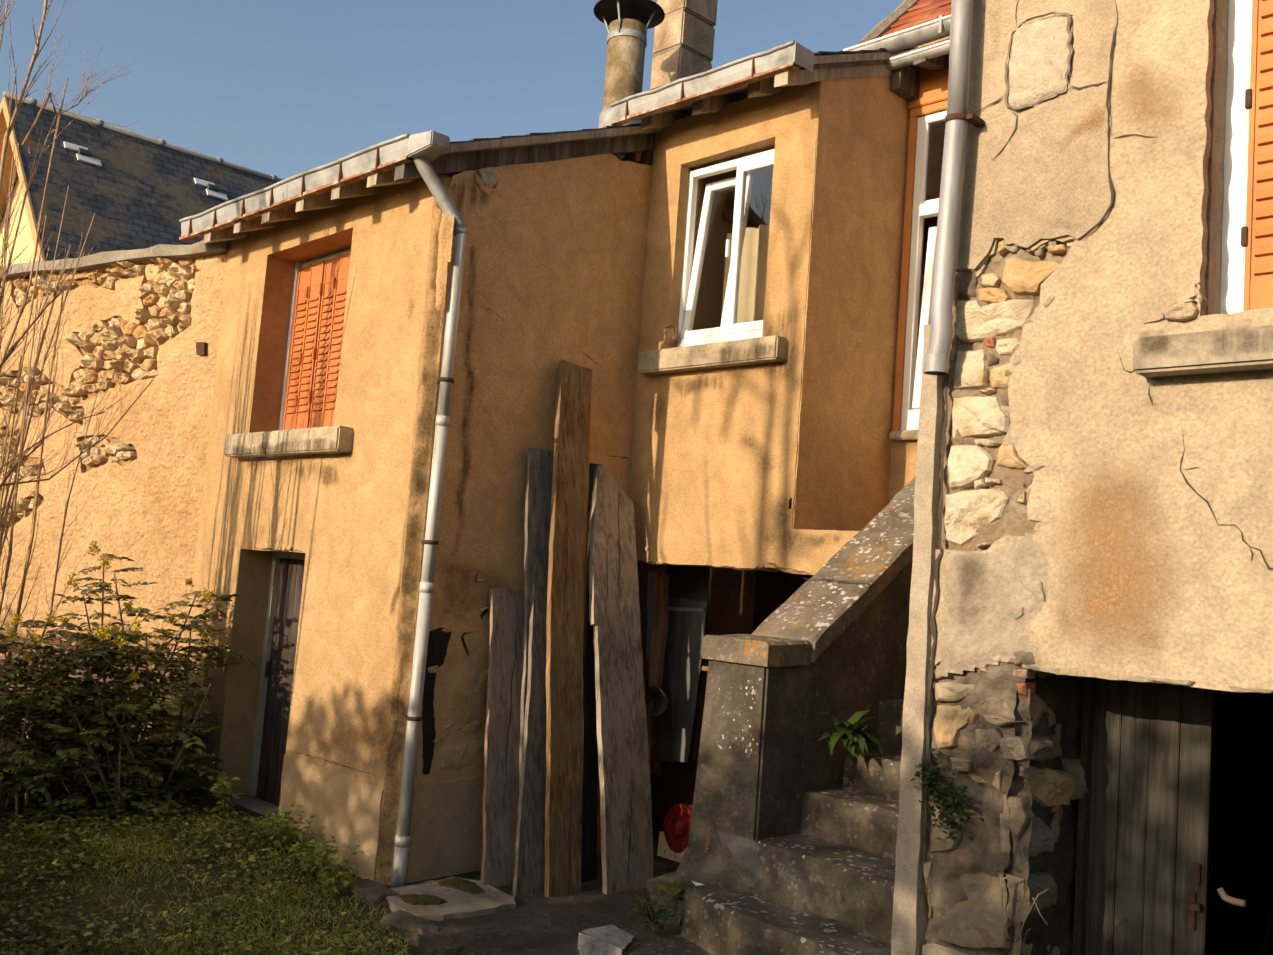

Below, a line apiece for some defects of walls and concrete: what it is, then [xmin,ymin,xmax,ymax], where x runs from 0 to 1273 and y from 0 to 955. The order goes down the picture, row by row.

crack [975,95,1018,161]
crack [1067,20,1152,138]
crack [1079,173,1114,239]
spalling [0,257,199,533]
spalling [923,82,1114,955]
leakage [1073,482,1159,633]
crack [1180,430,1273,570]
spalling [1130,676,1194,685]